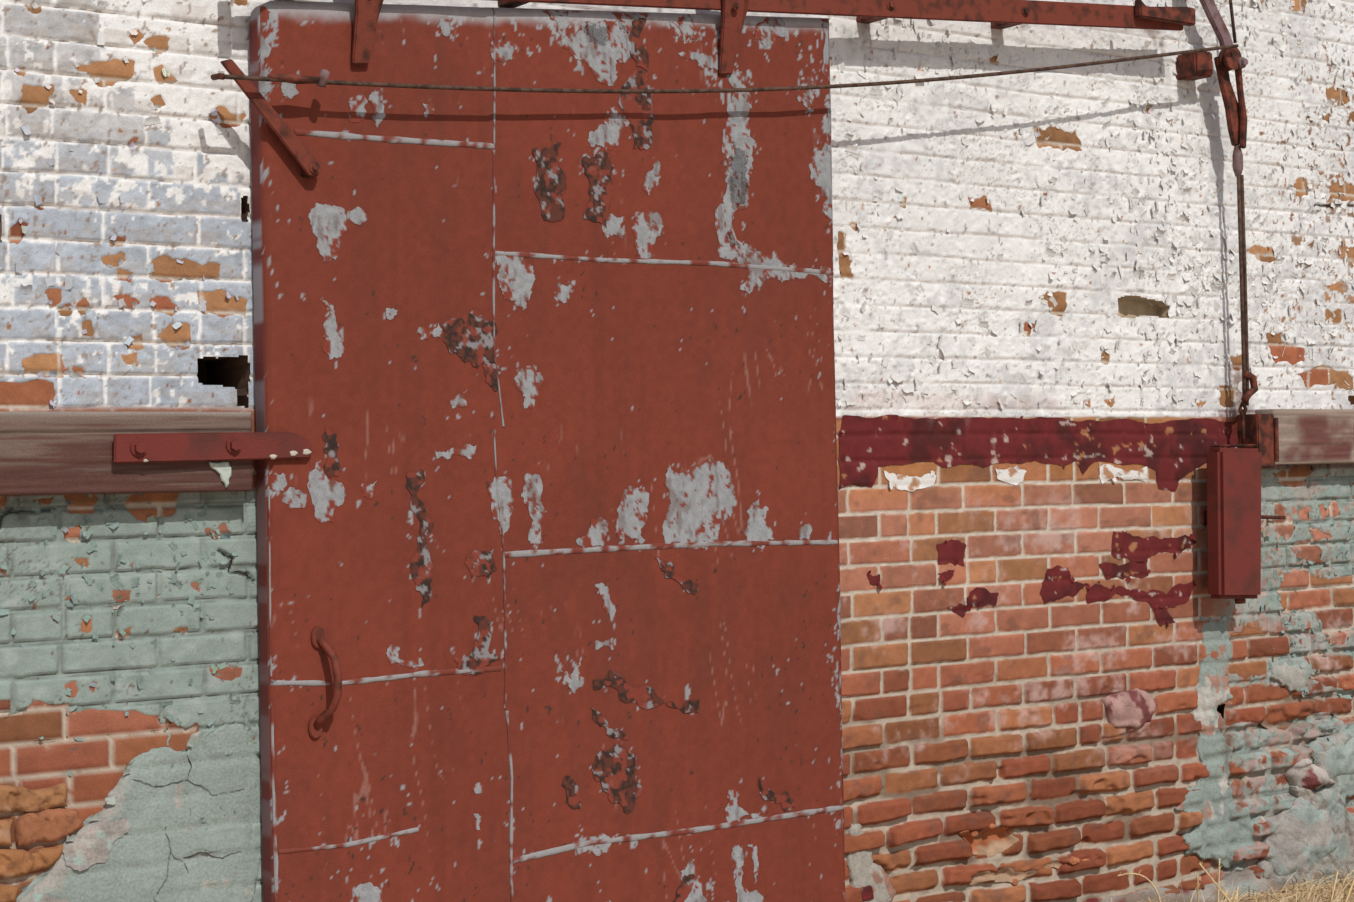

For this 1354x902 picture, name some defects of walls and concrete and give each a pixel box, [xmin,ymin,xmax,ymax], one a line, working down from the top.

peeling [14,29,177,148]
peeling [308,203,367,263]
corrosion [532,142,567,222]
corrosion [581,151,614,228]
peeling [668,0,1354,492]
spalling [101,234,250,408]
peeling [0,353,85,411]
peeling [268,460,379,523]
peeling [662,458,774,549]
peeling [1040,510,1207,626]
spalling [0,657,263,902]
crack [154,827,240,901]